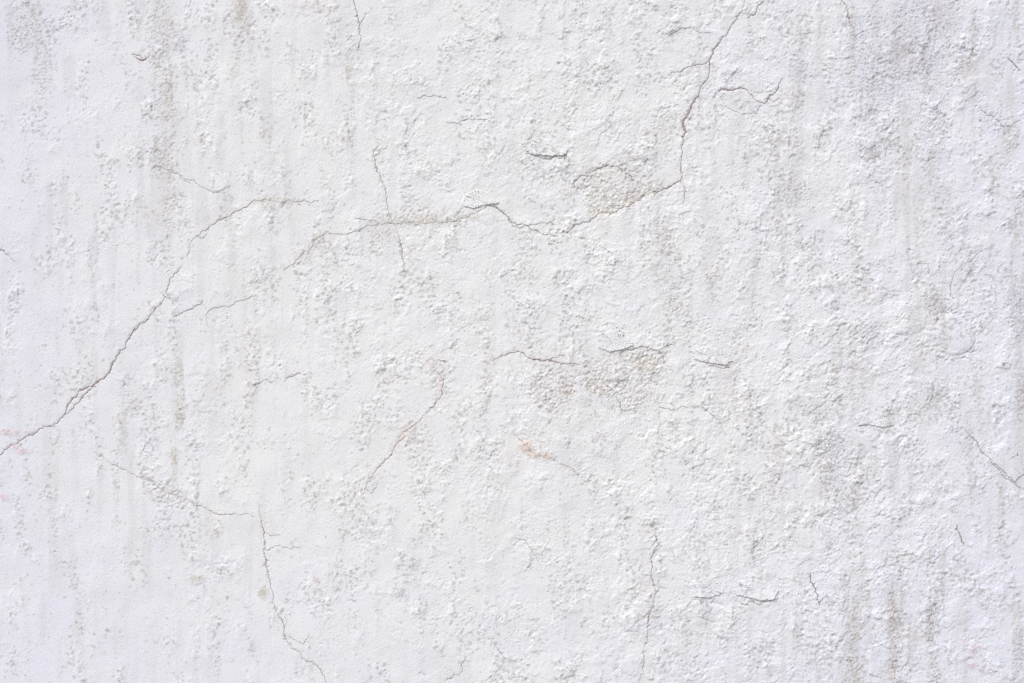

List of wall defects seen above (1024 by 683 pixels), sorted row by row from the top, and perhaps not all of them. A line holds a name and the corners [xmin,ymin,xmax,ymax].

crack [283,1,781,271]
crack [0,166,318,455]
crack [370,359,445,493]
crack [96,453,326,681]